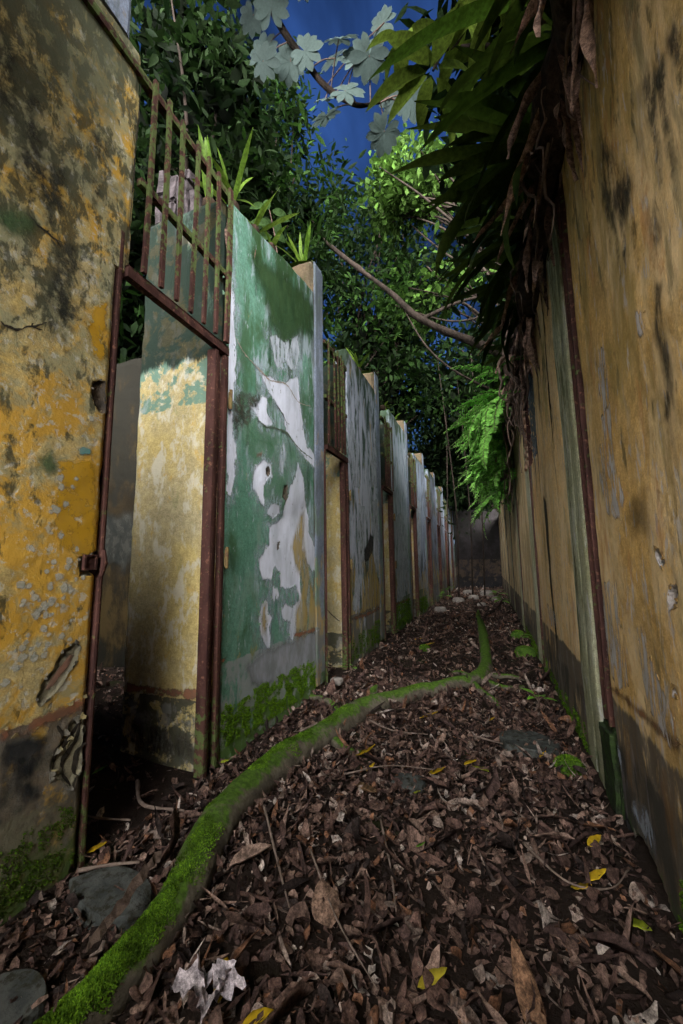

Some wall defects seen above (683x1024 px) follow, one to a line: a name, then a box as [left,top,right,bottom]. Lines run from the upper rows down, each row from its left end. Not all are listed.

water stain [643,22,682,140]
water stain [22,98,64,225]
crack [28,214,63,247]
water stain [601,144,631,231]
water stain [48,242,77,319]
crack [1,321,47,331]
peeling [223,258,320,685]
water stain [105,513,133,574]
peeling [1,639,87,791]